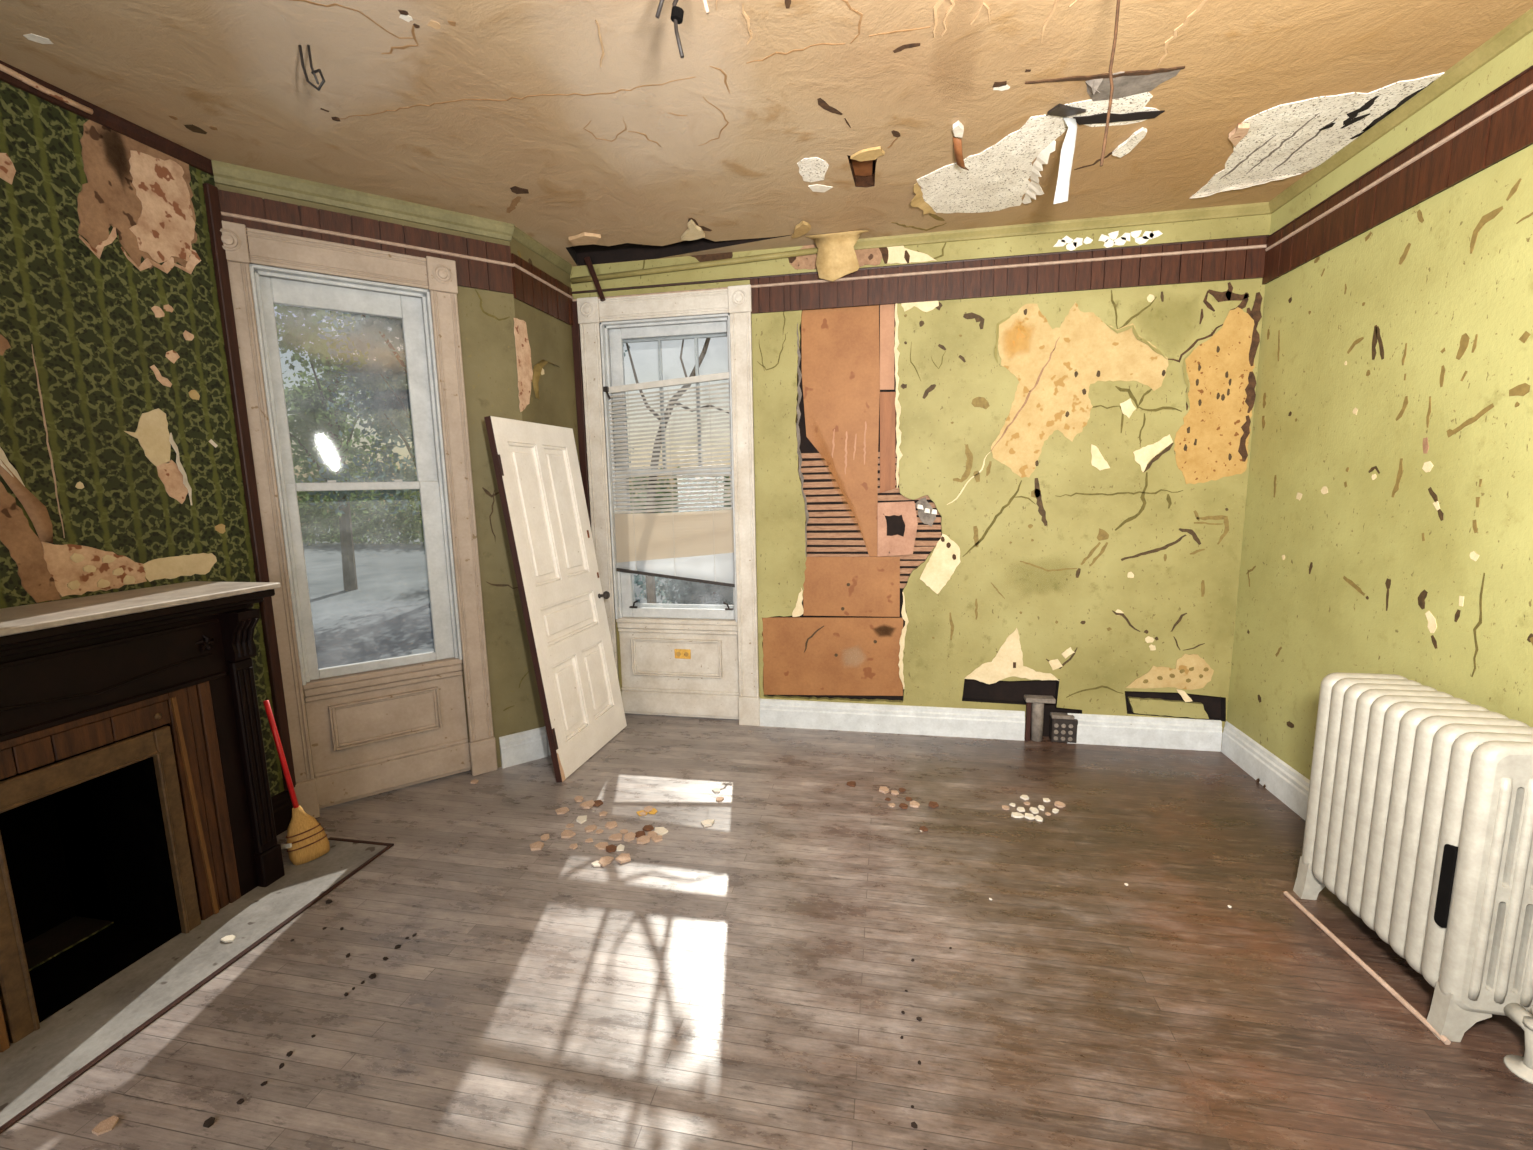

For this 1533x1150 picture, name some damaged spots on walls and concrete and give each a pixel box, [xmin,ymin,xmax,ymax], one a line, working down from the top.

crack [291,0,419,54]
crack [817,98,842,115]
flaking render [917,115,1068,213]
flaking render [1191,72,1444,197]
crack [892,214,946,259]
crack [1470,206,1503,254]
crack [962,289,1249,557]
peeling [953,292,1280,541]
flaking render [796,301,979,689]
spalling [42,542,217,597]
peeling [964,611,1077,684]
crack [1112,610,1205,650]